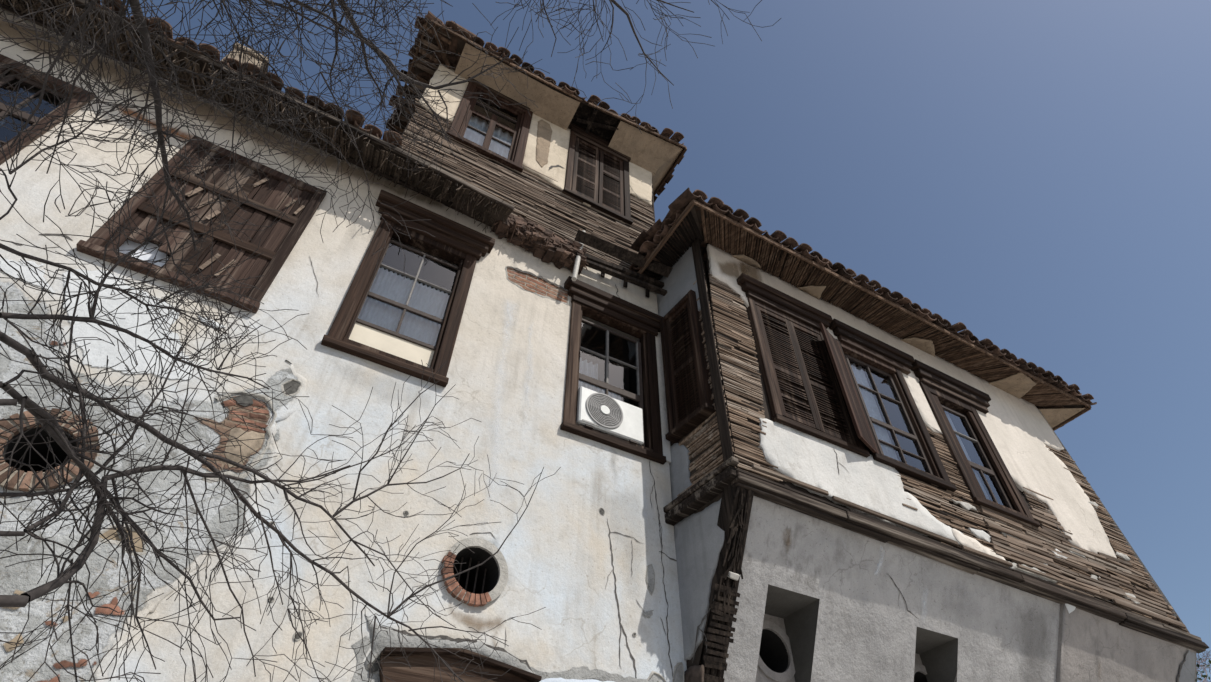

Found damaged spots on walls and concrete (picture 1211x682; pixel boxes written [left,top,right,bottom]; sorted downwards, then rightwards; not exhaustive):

flaking render [38,360,307,682]
crack [606,462,714,679]
flaking render [351,615,647,682]
spalling [672,662,684,682]
crack [1177,650,1189,682]